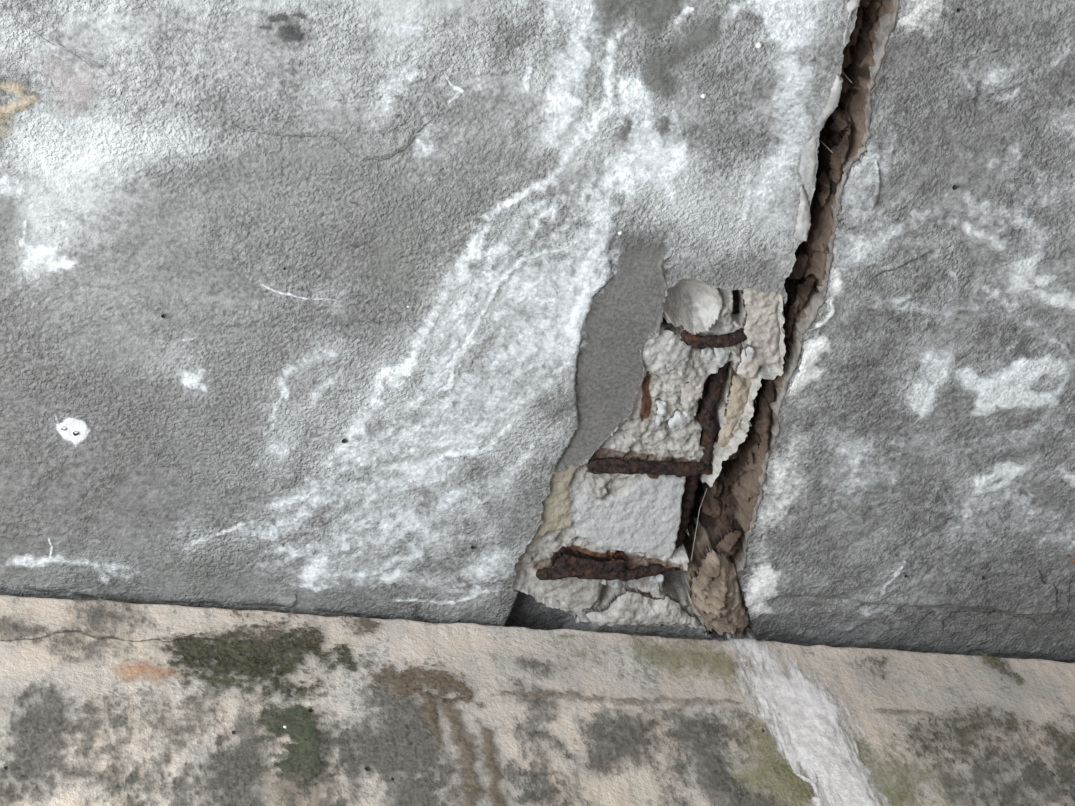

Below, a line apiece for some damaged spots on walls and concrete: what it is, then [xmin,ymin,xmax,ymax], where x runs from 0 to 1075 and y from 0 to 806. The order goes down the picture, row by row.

damp [726,0,832,223]
damp [181,369,206,390]
damp [398,549,513,605]
damp [216,0,716,592]
spalling [513,243,786,635]
crack [723,618,751,641]
damp [743,436,805,618]
crack [683,0,894,589]
efflorescence [833,438,895,497]
crack [869,252,928,281]
damp [0,634,888,806]
damp [893,702,1075,806]